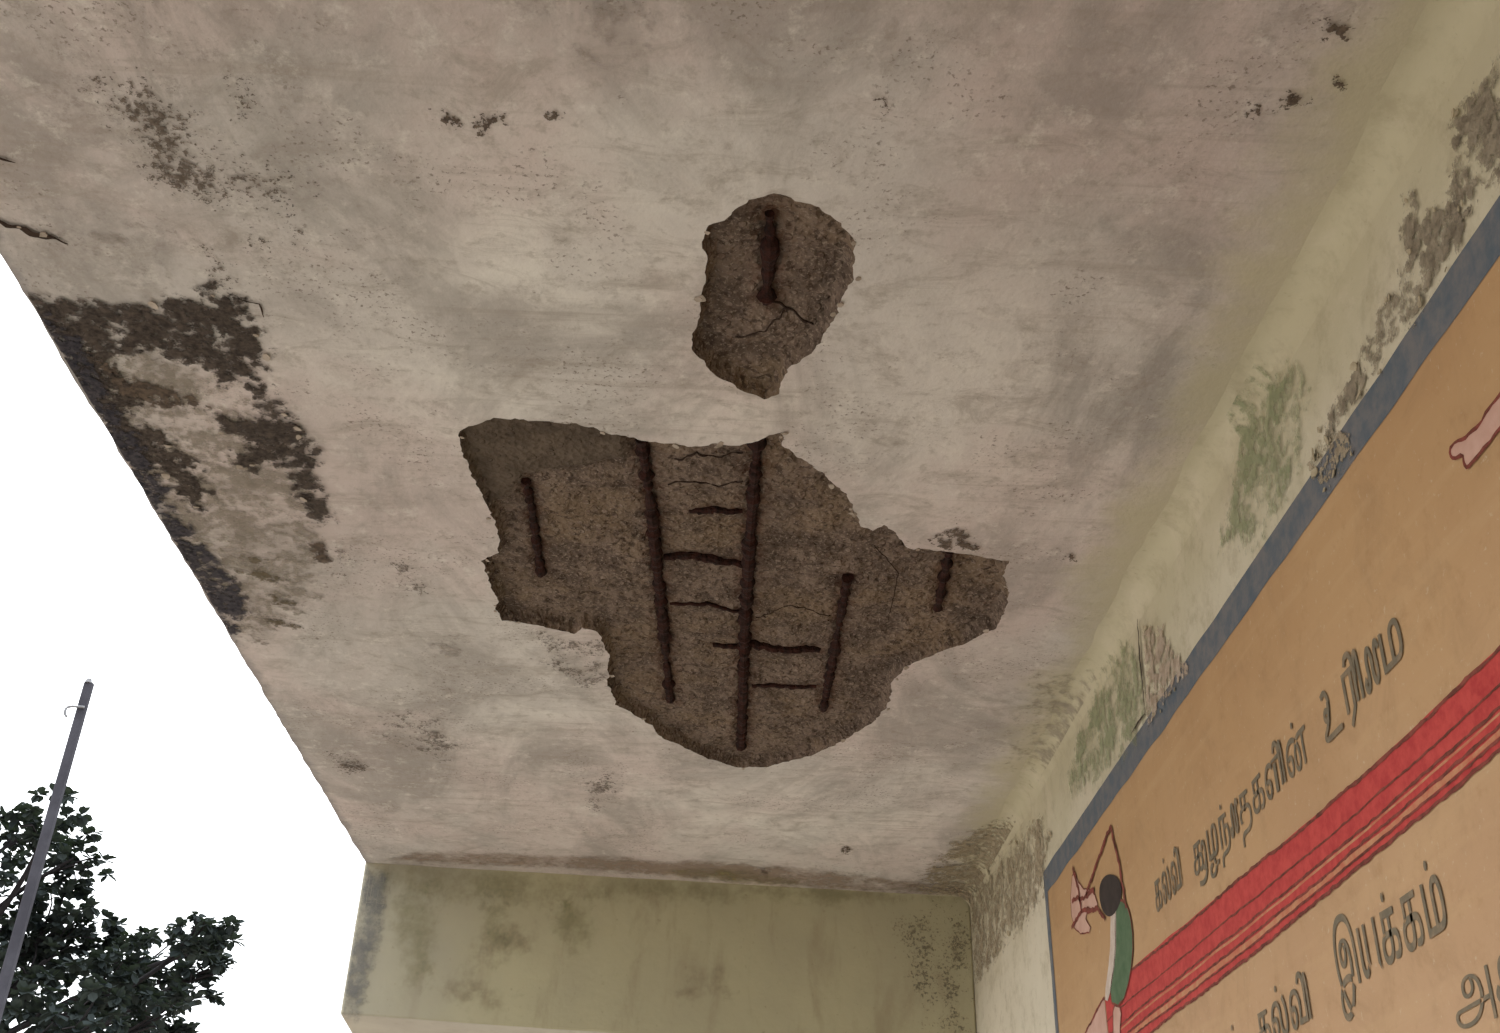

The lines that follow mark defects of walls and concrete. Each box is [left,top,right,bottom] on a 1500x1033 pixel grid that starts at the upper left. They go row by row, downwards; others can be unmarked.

crack [0,220,68,244]
damp [78,67,317,245]
spalling [692,193,861,399]
damp [27,245,350,645]
spalling [458,418,1010,770]
damp [346,874,386,1003]
damp [404,854,970,1033]